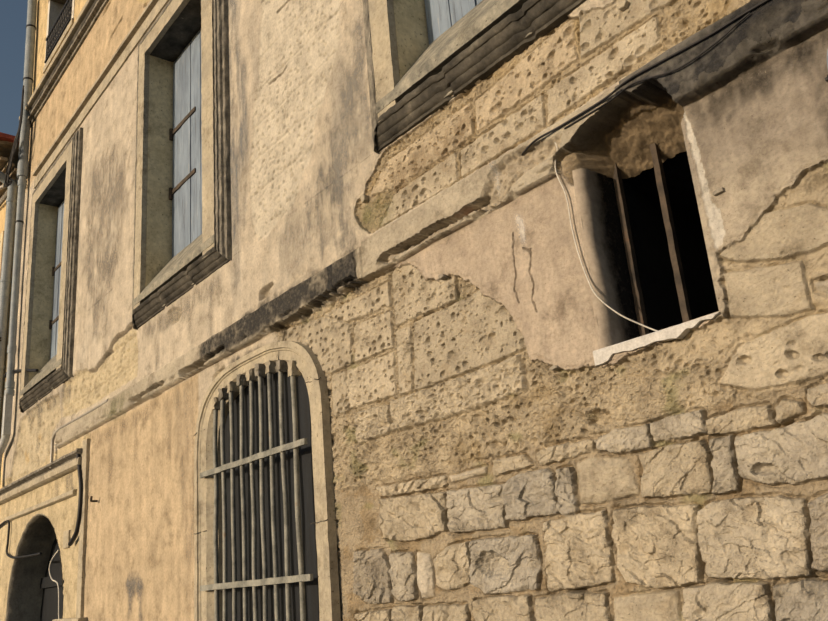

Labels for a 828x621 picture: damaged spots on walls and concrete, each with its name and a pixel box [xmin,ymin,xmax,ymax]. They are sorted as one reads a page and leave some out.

spalling [248,0,341,242]
spalling [258,281,274,301]
crack [511,231,538,313]
spalling [268,0,828,621]
spalling [8,328,138,485]